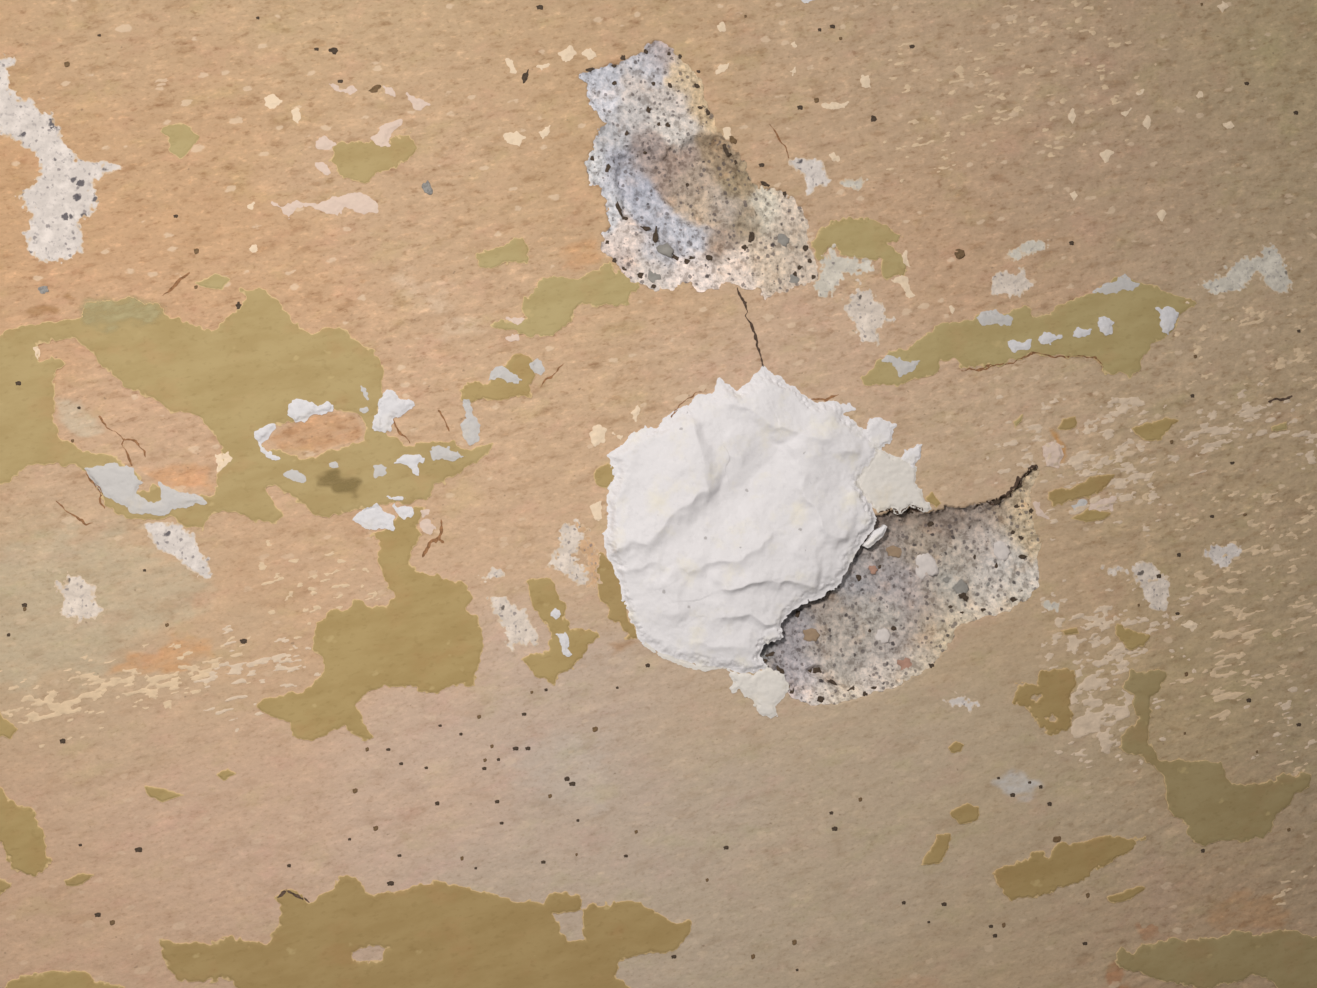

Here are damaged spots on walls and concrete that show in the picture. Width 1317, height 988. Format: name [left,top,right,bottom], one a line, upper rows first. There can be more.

flaking render [0,53,121,264]
flaking render [536,40,920,377]
crack [737,287,764,367]
flaking render [215,452,232,472]
flaking render [254,399,334,483]
flaking render [359,386,415,433]
flaking render [373,399,481,478]
flaking render [84,462,213,579]
flaking render [353,496,436,535]
flaking render [643,239,1317,776]